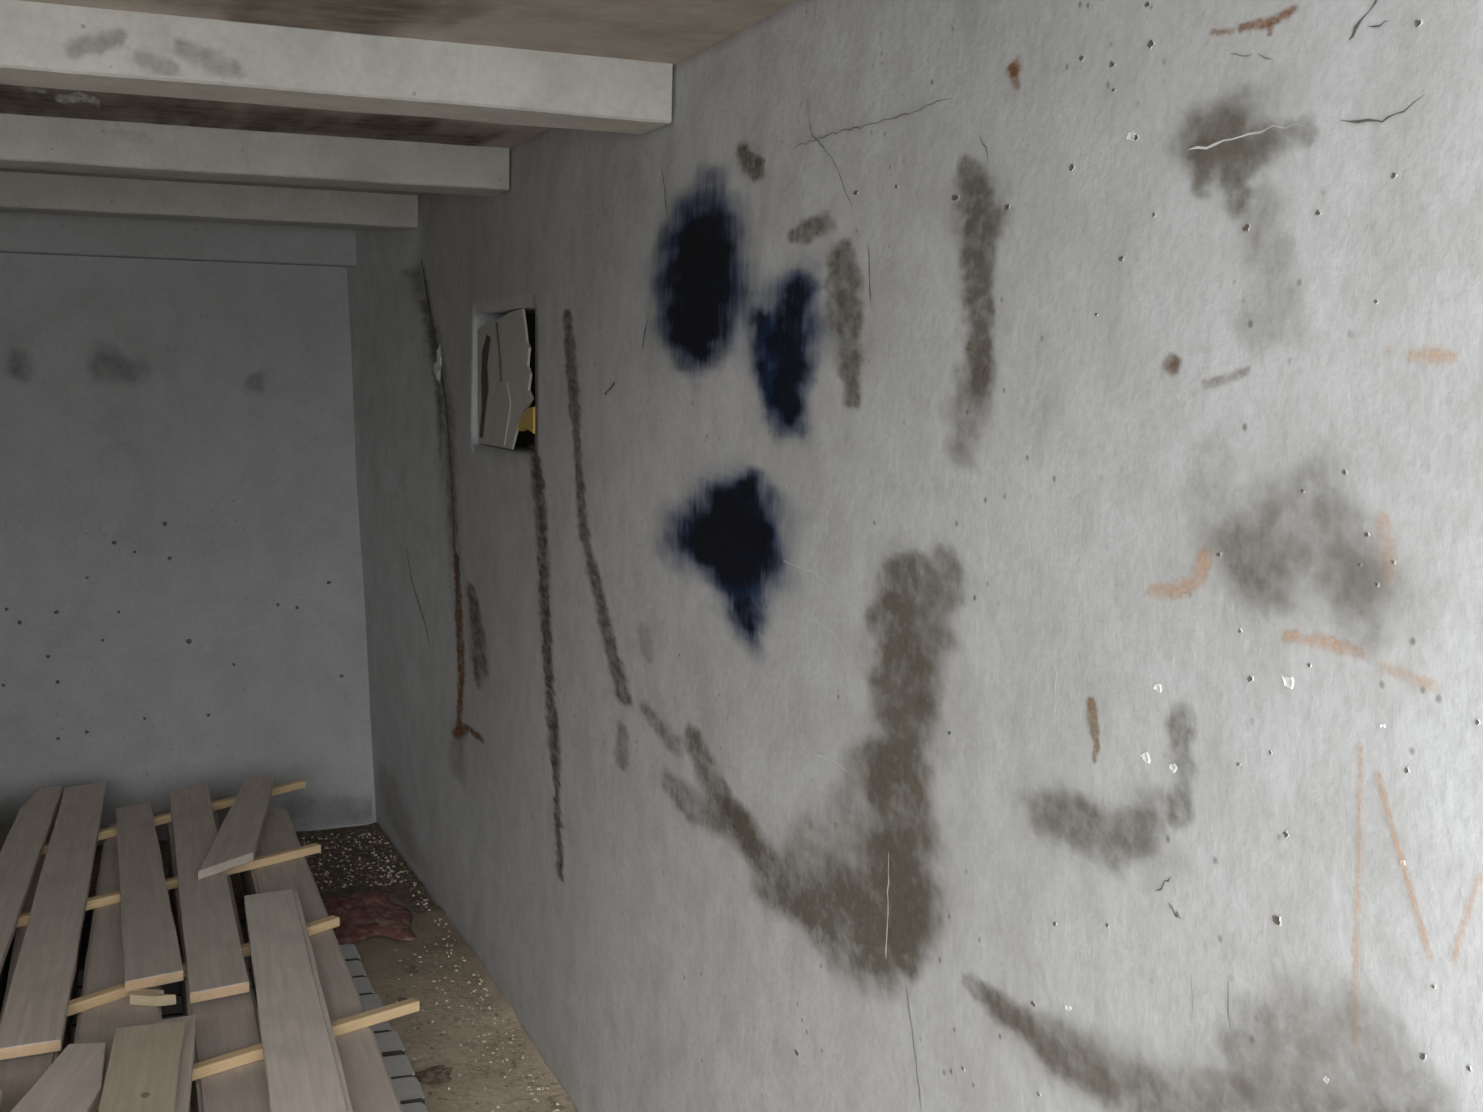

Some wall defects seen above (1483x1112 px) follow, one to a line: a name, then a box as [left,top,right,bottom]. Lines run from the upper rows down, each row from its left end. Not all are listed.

crack [1349,0,1388,40]
leakage [1189,109,1266,210]
leakage [750,310,776,391]
leakage [829,242,860,405]
leakage [960,159,1000,395]
leakage [565,311,630,703]
rust [454,555,483,742]
leakage [533,458,563,878]